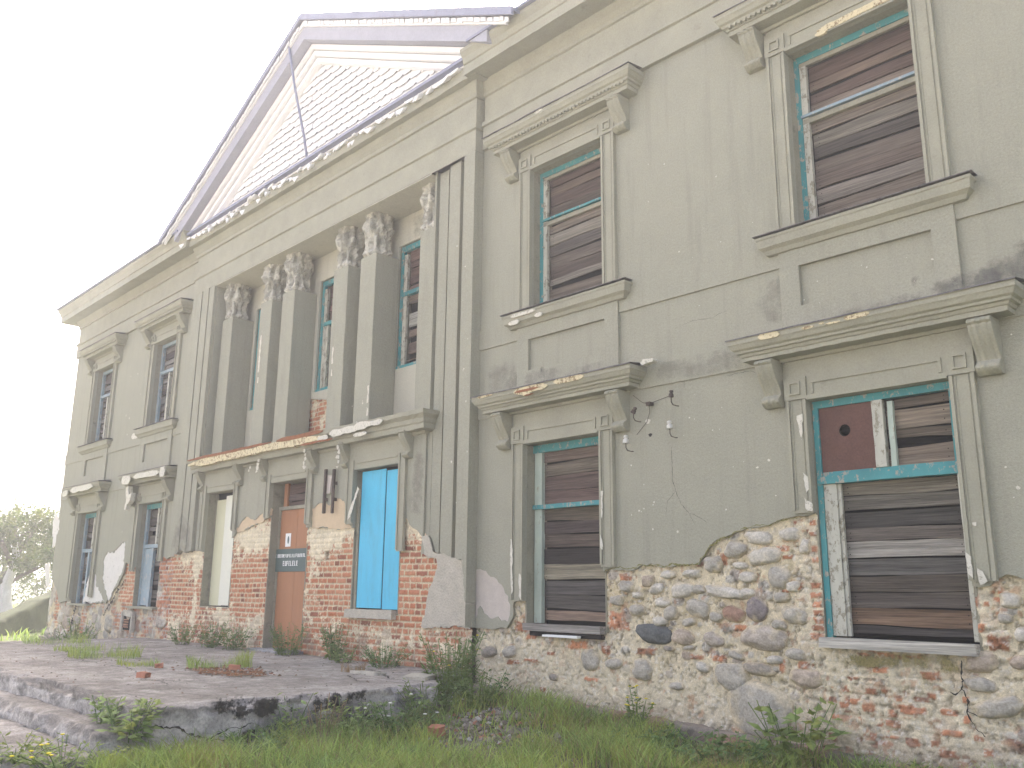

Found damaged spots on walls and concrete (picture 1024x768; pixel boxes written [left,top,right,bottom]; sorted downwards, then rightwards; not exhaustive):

flaking render [815,0,889,37]
flaking render [758,331,780,340]
flaking render [801,311,869,330]
flaking render [514,374,584,396]
spalling [188,385,383,473]
flaking render [62,484,93,497]
flaking render [43,508,273,648]
flaking render [301,473,1024,768]
crack [950,661,985,737]